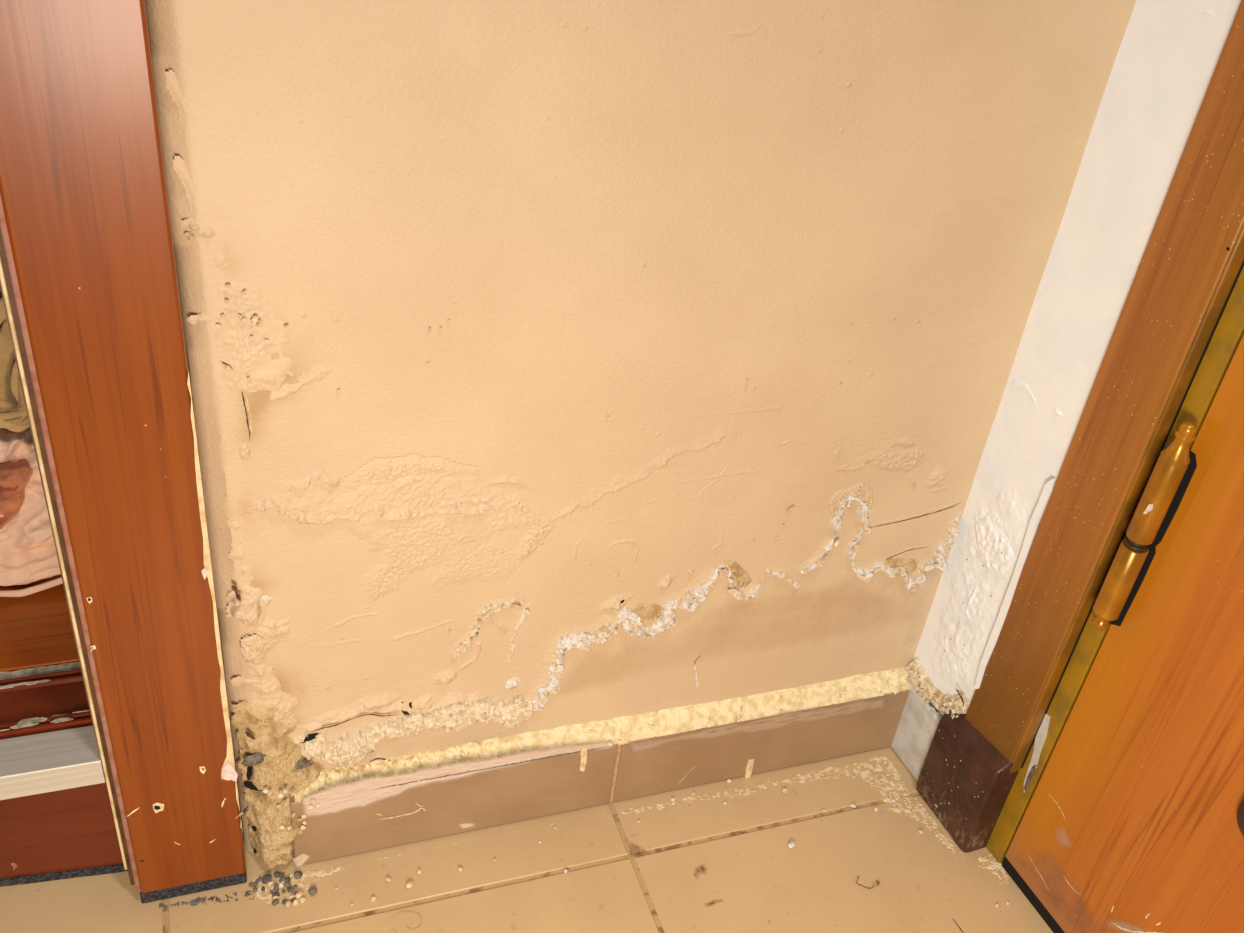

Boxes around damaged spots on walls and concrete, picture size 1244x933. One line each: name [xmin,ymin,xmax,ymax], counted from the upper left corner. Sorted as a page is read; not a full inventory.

peeling [206,249,345,407]
spalling [226,495,969,869]